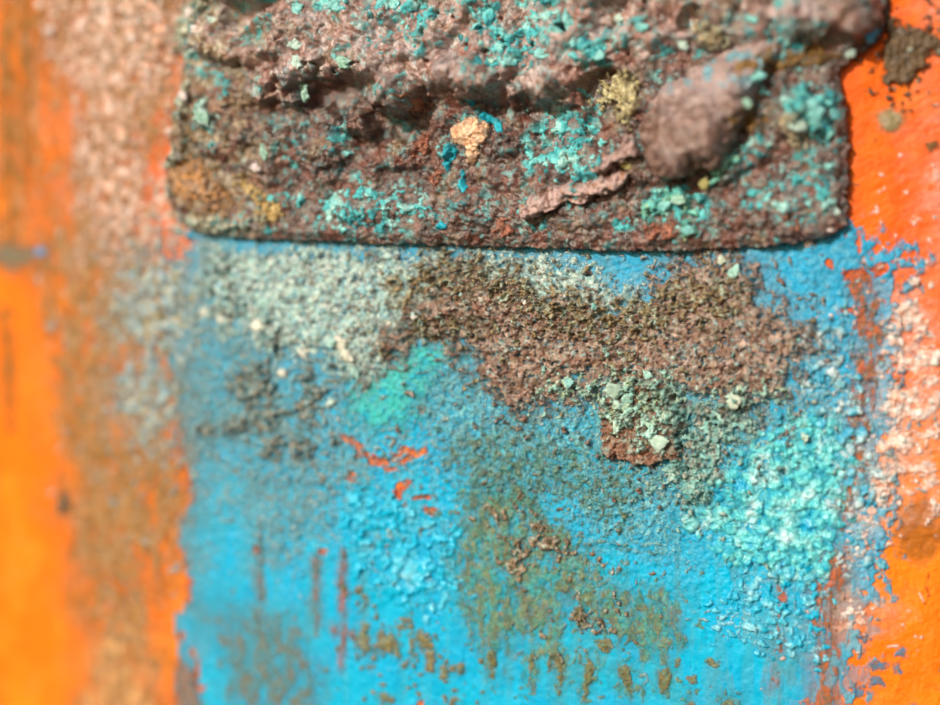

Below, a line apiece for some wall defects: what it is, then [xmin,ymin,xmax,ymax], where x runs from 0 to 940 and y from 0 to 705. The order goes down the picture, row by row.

peeling [821,260,888,282]
rust [341,131,884,532]
peeling [338,433,438,517]
rust [774,585,788,652]
rust [812,547,849,705]